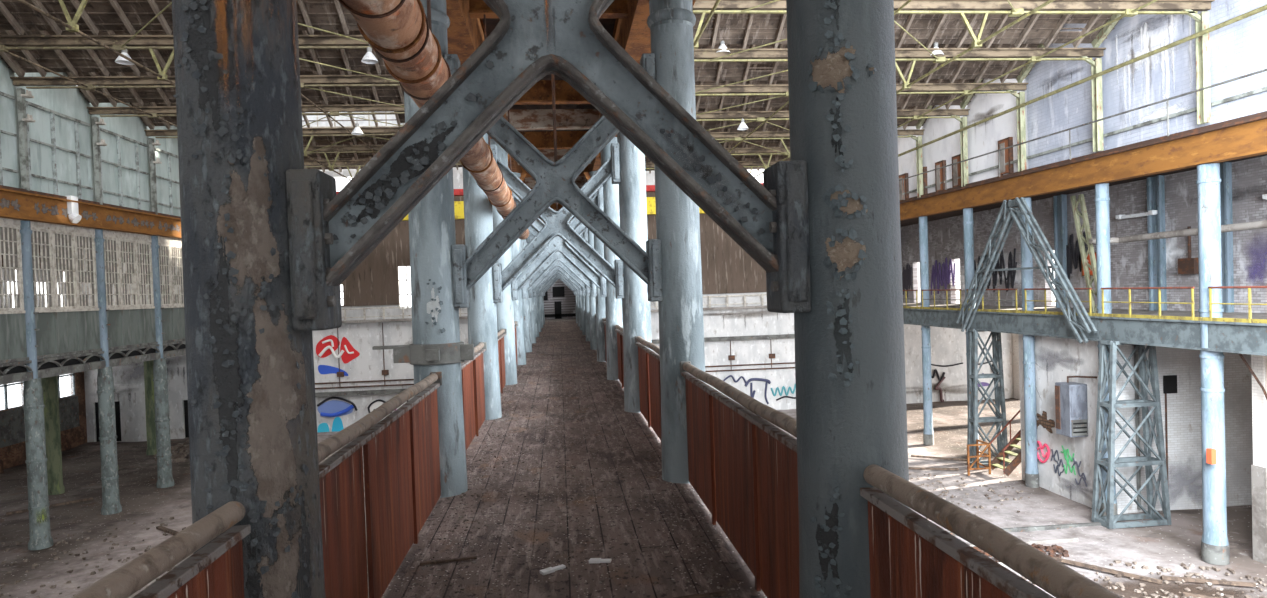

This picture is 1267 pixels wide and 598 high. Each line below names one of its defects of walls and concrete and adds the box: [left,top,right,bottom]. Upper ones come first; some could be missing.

peeling [807,0,877,173]
peeling [177,0,316,598]
peeling [823,191,868,387]
peeling [810,487,852,598]